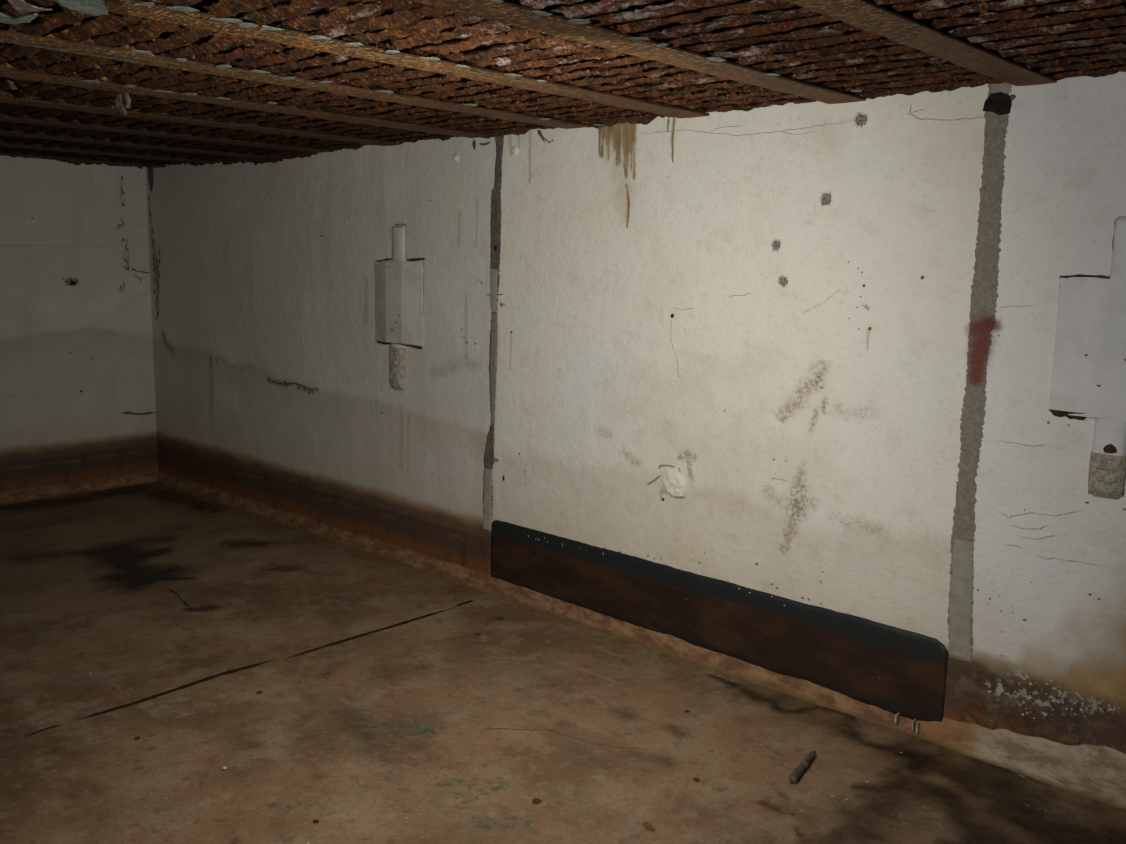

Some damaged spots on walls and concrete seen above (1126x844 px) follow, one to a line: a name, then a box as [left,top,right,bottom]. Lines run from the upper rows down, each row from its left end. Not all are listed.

corrosion [1045,64,1126,81]
peeling [52,79,252,106]
corrosion [699,97,816,113]
corrosion [850,77,1000,99]
corrosion [481,124,556,139]
corrosion [161,142,367,166]
corrosion [578,112,675,227]
leakage [0,433,504,581]
crack [170,589,217,611]
crack [27,600,473,736]
leakage [943,650,1126,754]
leakage [709,675,1126,844]